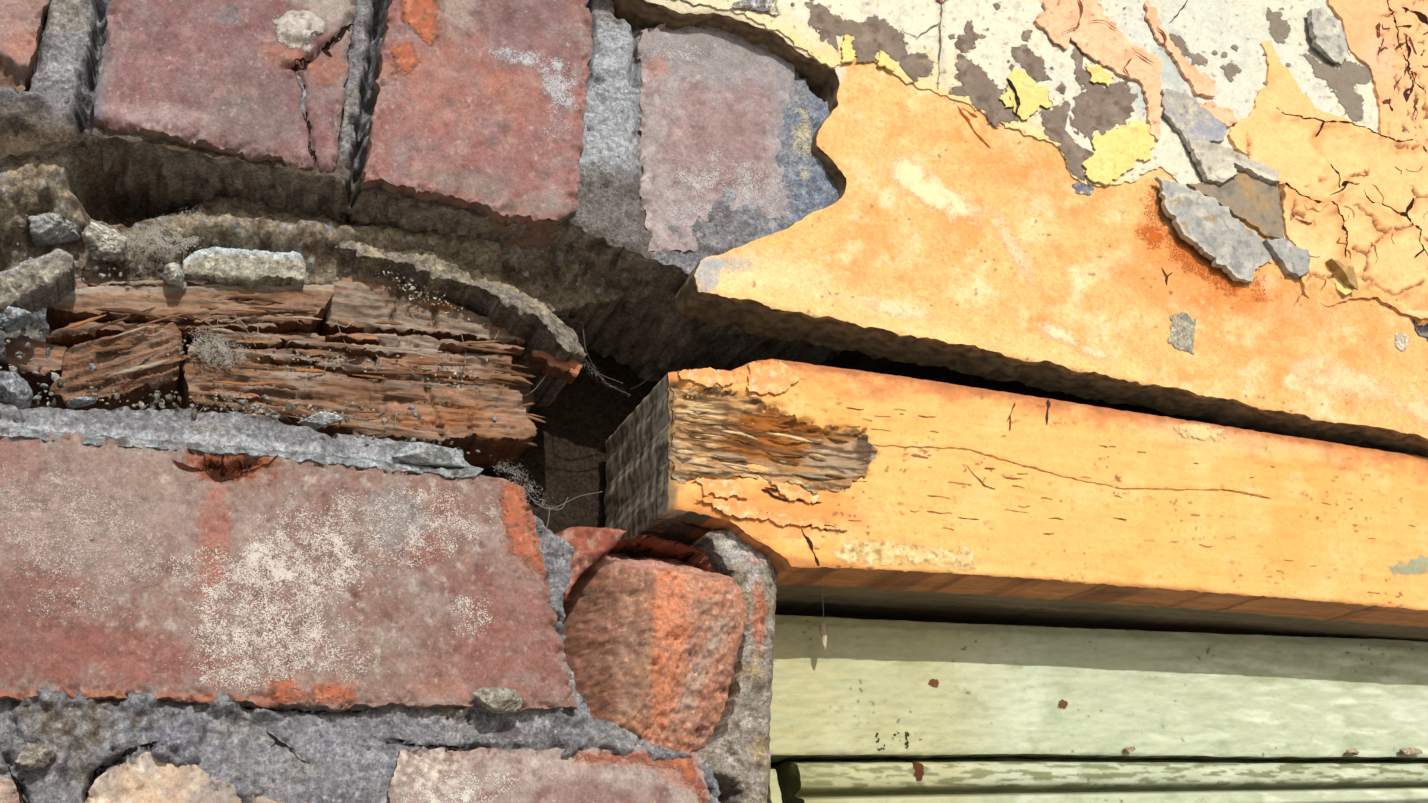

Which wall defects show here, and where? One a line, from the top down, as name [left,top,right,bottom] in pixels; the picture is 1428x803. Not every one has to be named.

crack [290,1,357,163]
peeling [675,0,1428,354]
crack [1276,0,1428,300]
peeling [677,360,801,396]
peeling [693,475,848,532]
crack [846,399,1274,534]